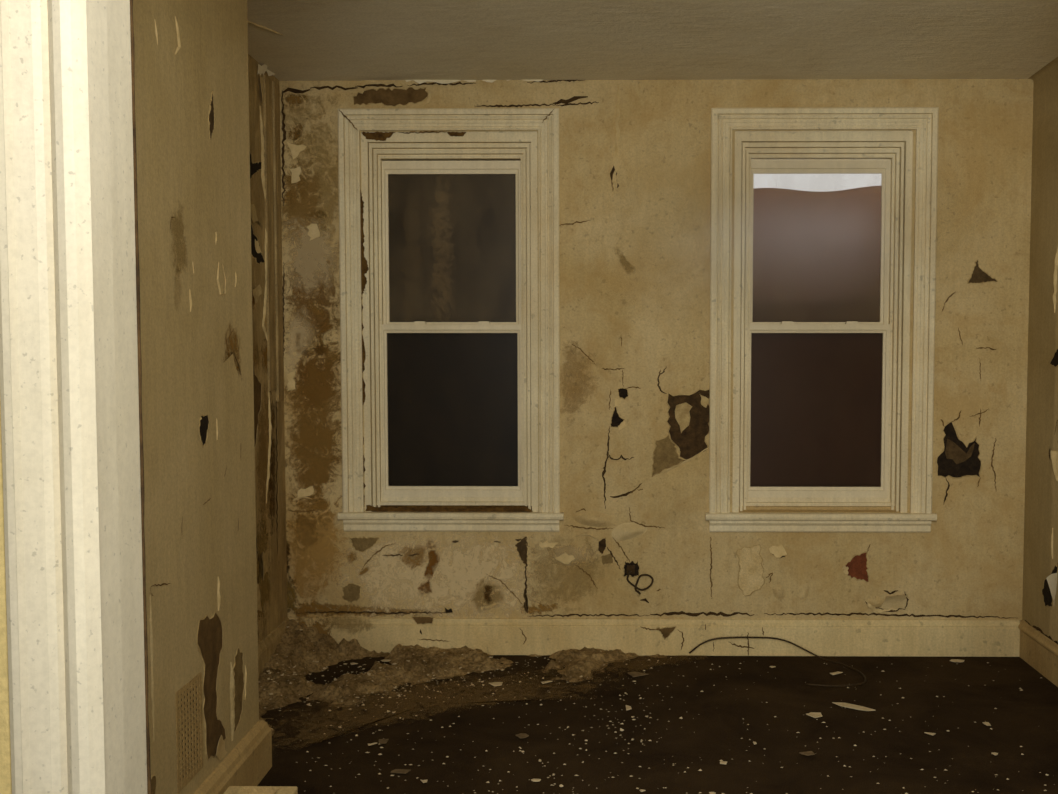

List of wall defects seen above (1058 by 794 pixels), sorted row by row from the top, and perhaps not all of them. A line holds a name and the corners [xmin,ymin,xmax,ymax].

peeling [258,64,280,198]
crack [281,80,599,206]
peeling [250,202,268,341]
crack [279,262,287,358]
crack [657,366,667,394]
peeling [287,486,318,513]
crack [602,426,643,508]
spalling [651,389,709,477]
hole [935,411,982,502]
peeling [842,545,870,583]
peeling [1046,573,1057,600]
peeling [196,577,247,761]